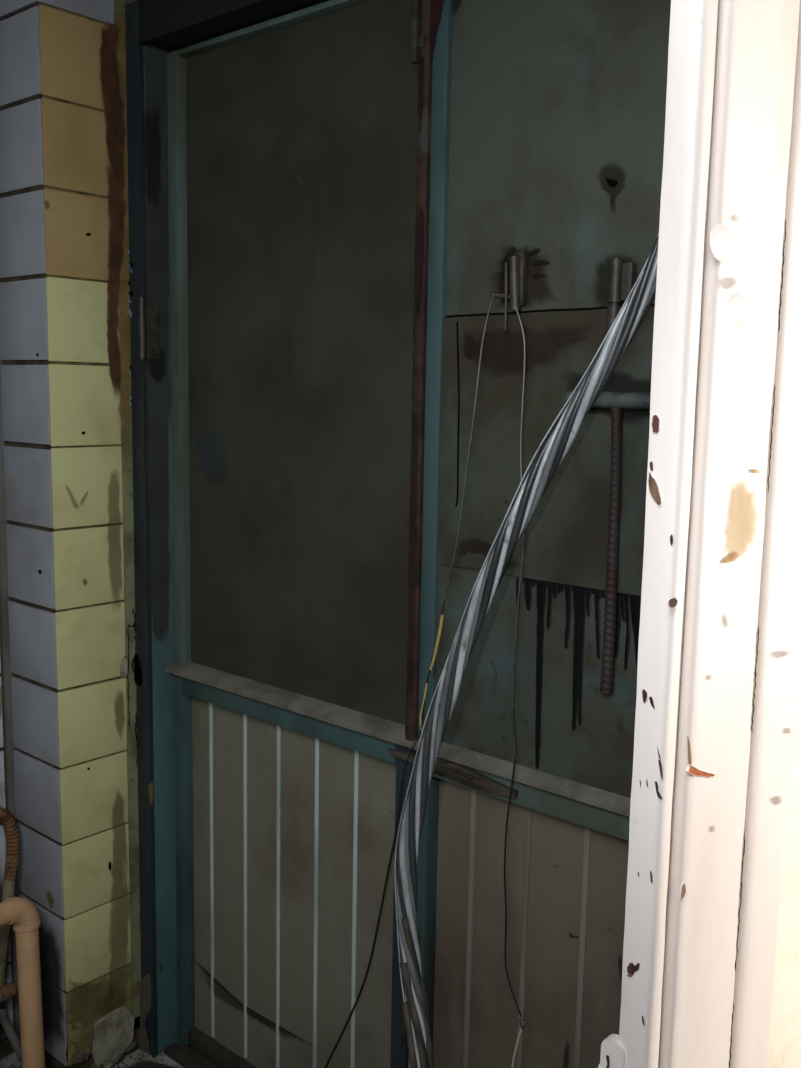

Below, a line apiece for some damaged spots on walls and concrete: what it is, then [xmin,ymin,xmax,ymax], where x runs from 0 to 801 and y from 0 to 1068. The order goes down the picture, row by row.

corrosion [601,167,624,208]
corrosion [100,13,131,442]
peeling [651,414,660,435]
peeling [648,462,662,508]
water stain [722,488,757,563]
water stain [516,578,641,769]
peeling [642,688,655,709]
peeling [640,747,663,799]
peeling [686,736,716,778]